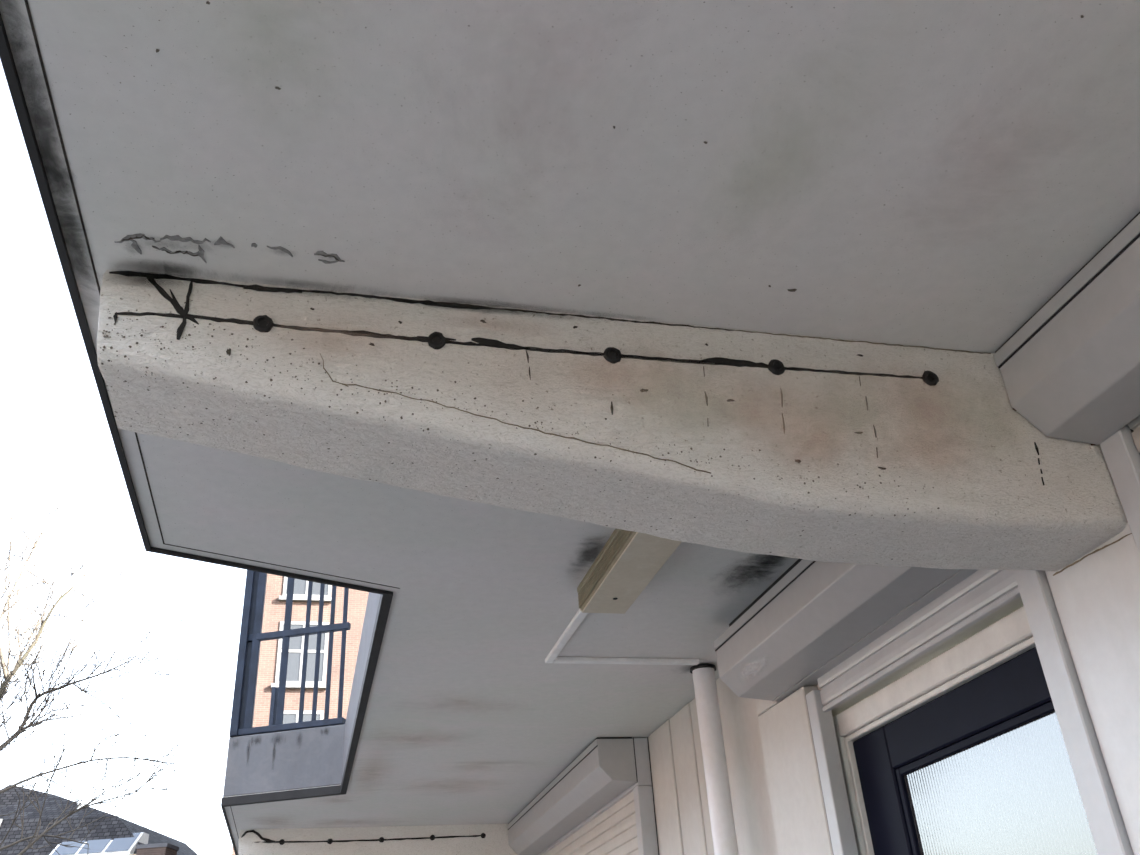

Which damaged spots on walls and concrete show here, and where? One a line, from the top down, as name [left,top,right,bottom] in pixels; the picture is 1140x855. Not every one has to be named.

peeling [114,233,235,263]
peeling [314,251,345,264]
crack [109,271,991,474]
crack [241,830,483,843]